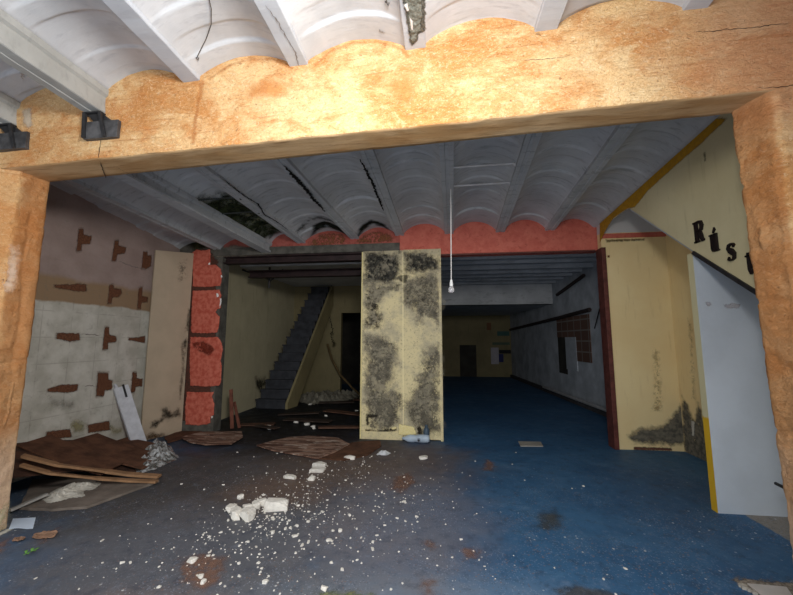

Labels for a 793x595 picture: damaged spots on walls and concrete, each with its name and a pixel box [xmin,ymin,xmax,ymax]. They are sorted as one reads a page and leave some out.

spalling [403,0,426,45]
crack [697,24,778,32]
crack [217,174,288,230]
crack [285,166,325,212]
crack [360,159,384,211]
flaking render [182,249,223,425]
leakage [364,253,440,434]
leakage [630,401,707,462]